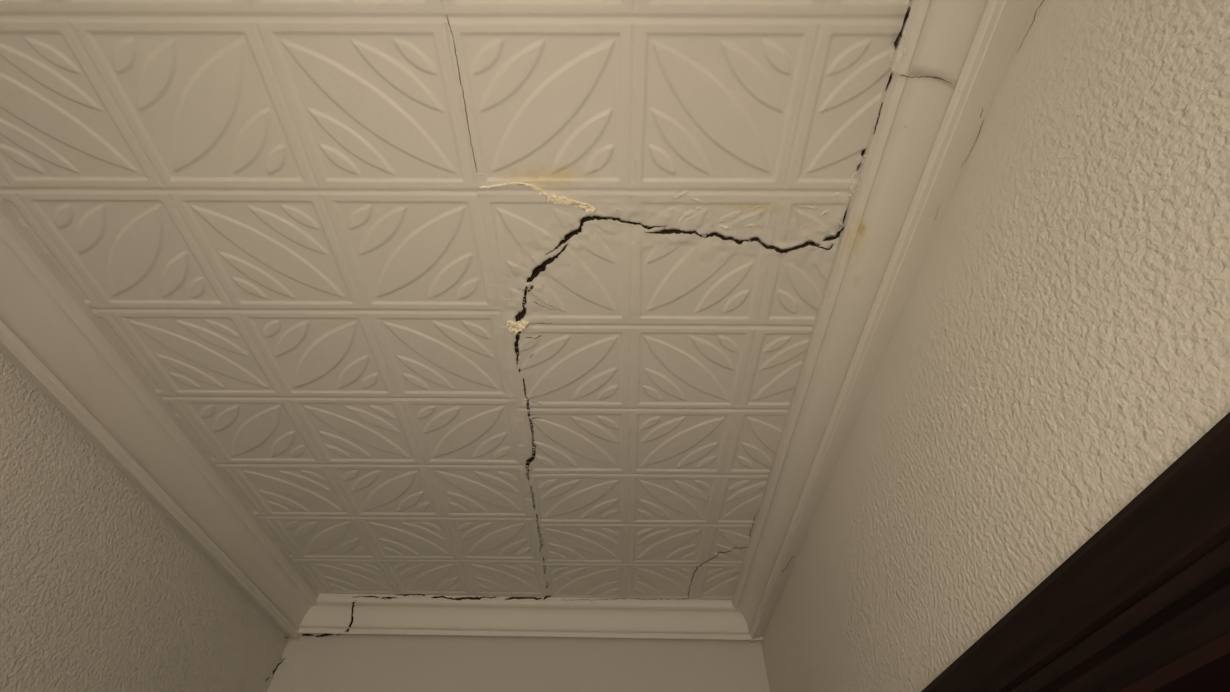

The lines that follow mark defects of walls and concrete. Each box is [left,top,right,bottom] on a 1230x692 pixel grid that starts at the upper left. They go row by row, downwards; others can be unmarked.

crack [265,0,952,682]